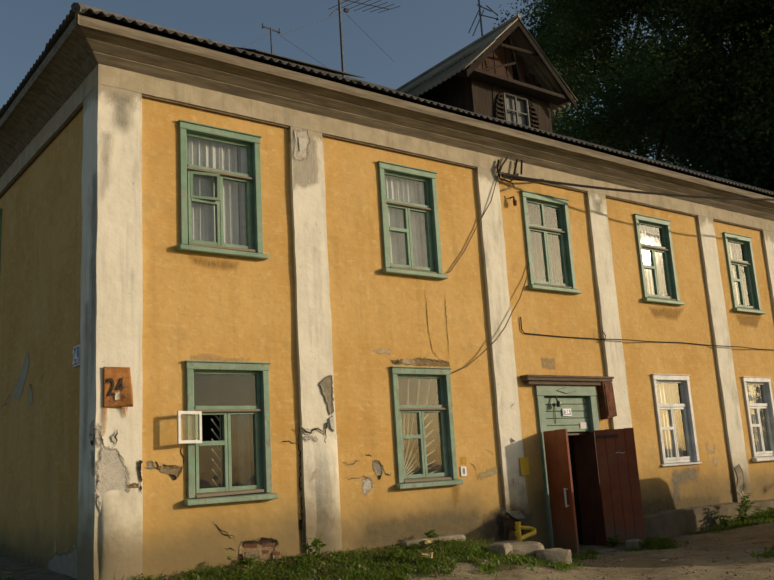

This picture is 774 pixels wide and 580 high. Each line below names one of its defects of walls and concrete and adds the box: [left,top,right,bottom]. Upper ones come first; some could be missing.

peeling [293,129,310,161]
crack [425,298,449,361]
spalling [374,349,450,367]
spalling [319,375,335,431]
peeling [89,420,183,512]
crack [282,425,326,544]
crack [342,454,371,480]
spalling [362,460,384,494]
crack [212,521,238,551]
spalling [238,537,280,562]